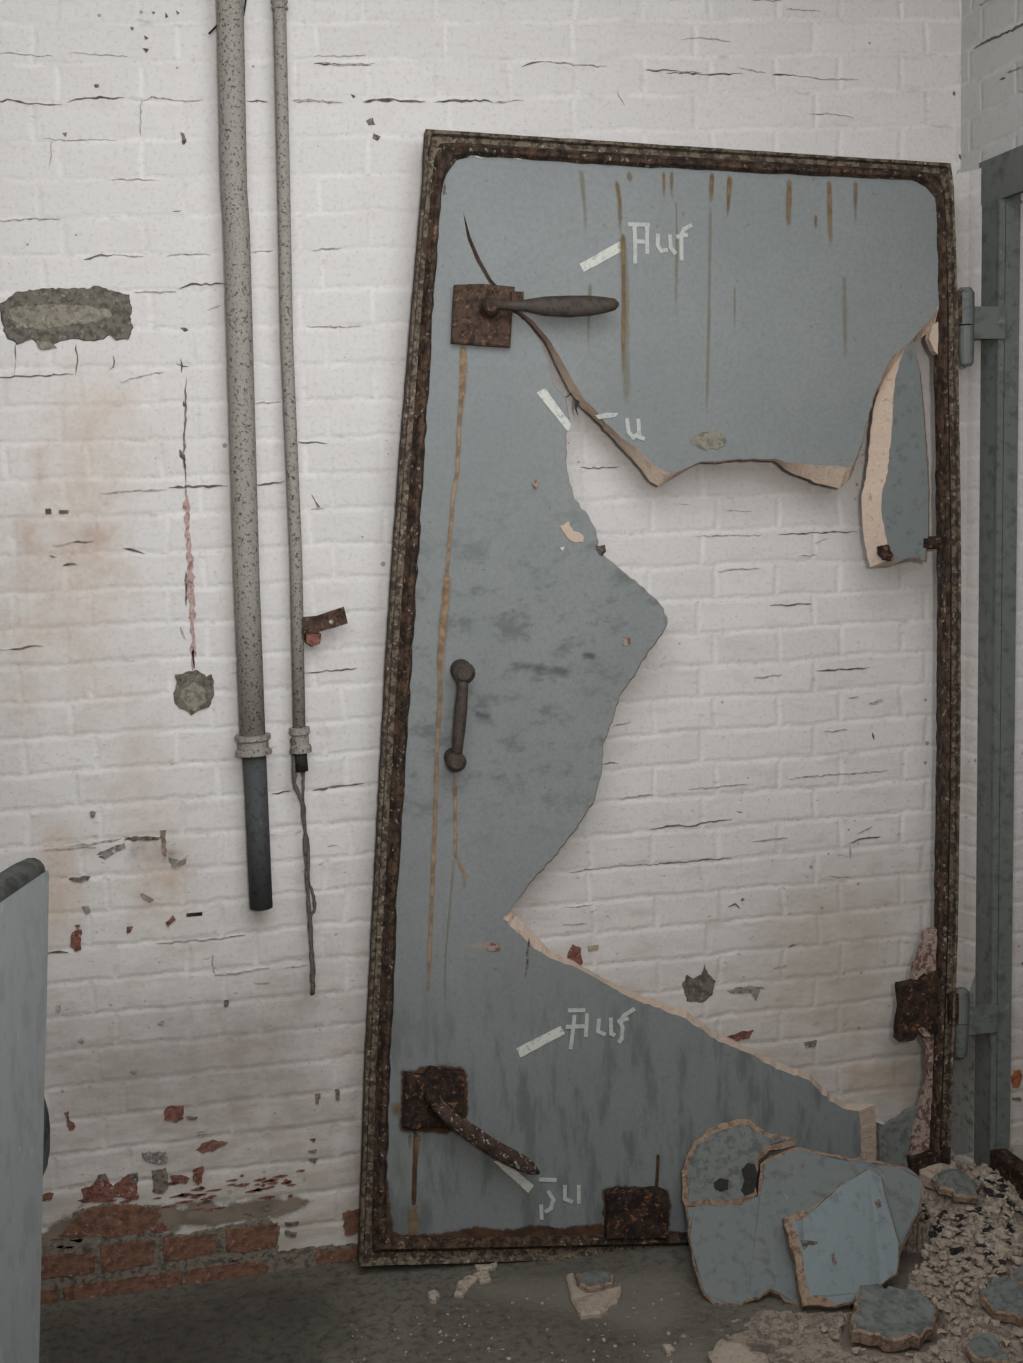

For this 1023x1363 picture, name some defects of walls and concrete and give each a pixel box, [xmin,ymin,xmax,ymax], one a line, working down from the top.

corrosion [709,175,732,203]
corrosion [814,182,832,237]
corrosion [616,173,631,372]
peeling [0,286,134,350]
peeling [559,521,606,556]
corrosion [877,544,894,561]
corrosion [428,347,467,985]
spalling [567,944,599,966]
spalling [682,965,761,1003]
spalling [727,1030,754,1041]
corrosion [386,1065,680,1238]
peeling [40,1105,359,1305]